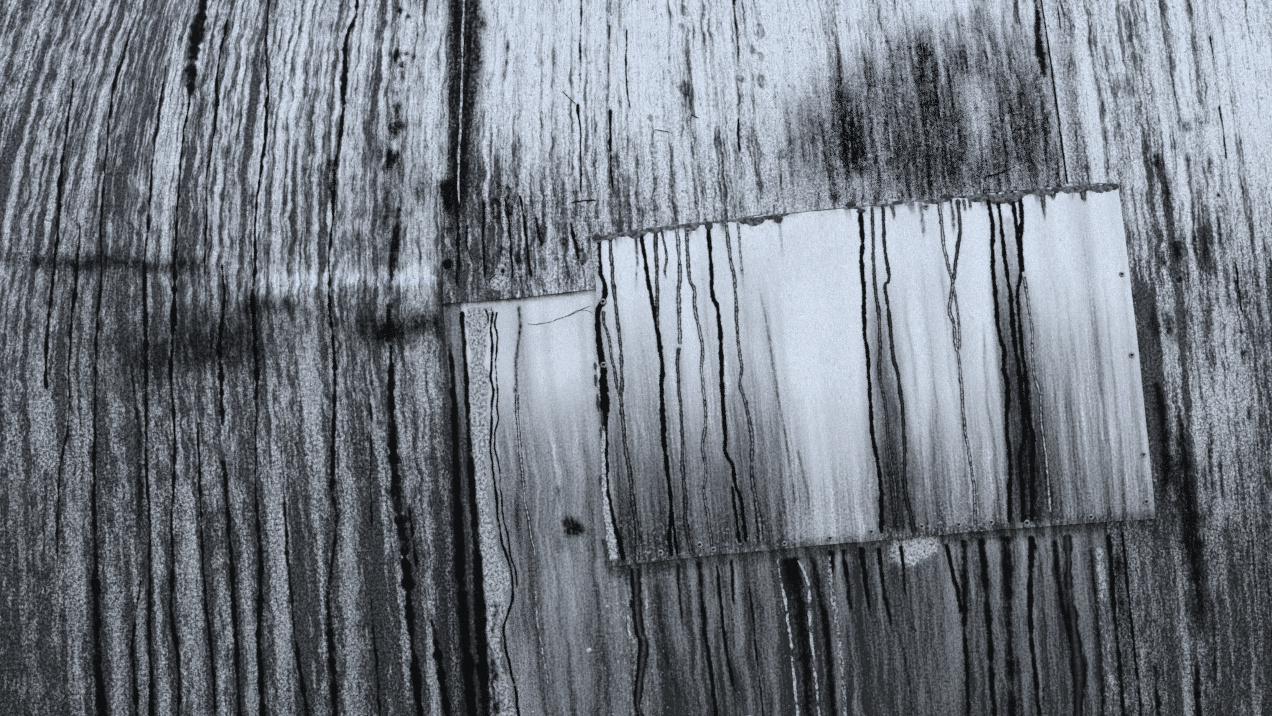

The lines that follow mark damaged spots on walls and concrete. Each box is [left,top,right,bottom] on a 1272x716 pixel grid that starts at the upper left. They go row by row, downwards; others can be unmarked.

leakage [789,0,1068,201]
corrosion [777,205,917,716]
corrosion [938,191,1052,716]
corrosion [1052,534,1104,716]